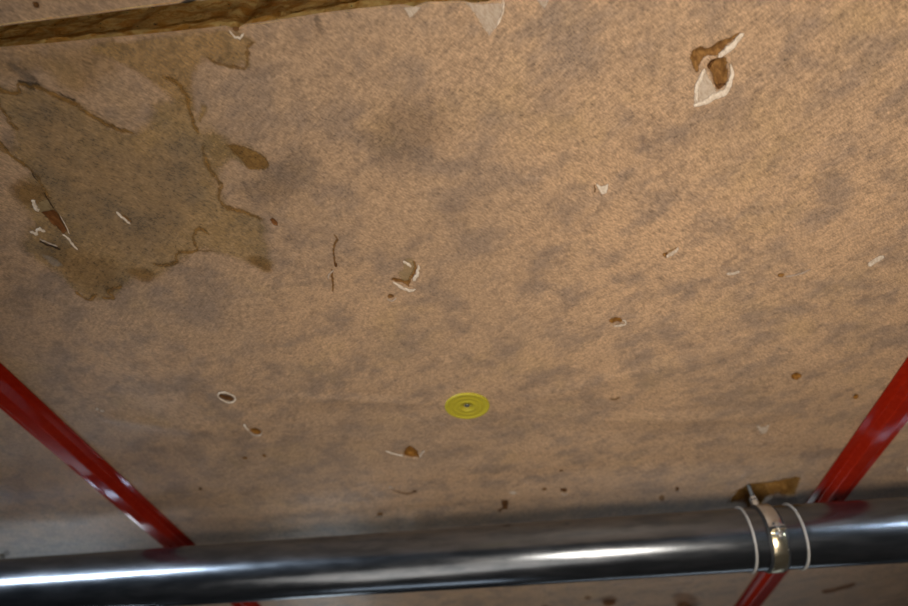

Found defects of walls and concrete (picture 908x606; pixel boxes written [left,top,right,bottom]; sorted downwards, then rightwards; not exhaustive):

leakage [0,30,270,301]